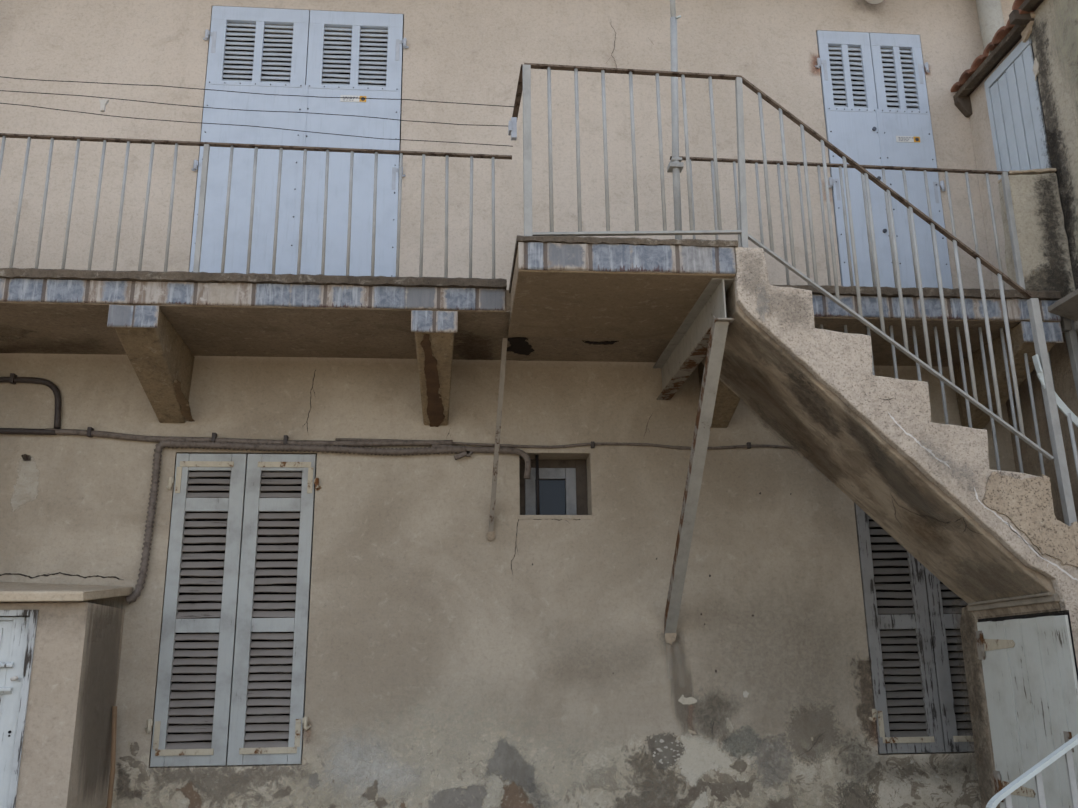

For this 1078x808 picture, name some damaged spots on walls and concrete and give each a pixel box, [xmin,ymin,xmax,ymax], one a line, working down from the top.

damp [1024,0,1078,298]
crack [879,397,951,469]
crack [511,519,580,574]
crack [891,488,1078,581]
crack [0,572,121,580]
flaking render [120,741,145,783]
flaking render [176,782,203,808]
flaking render [272,786,294,808]
flaking render [362,777,408,808]
flaking render [428,772,537,808]